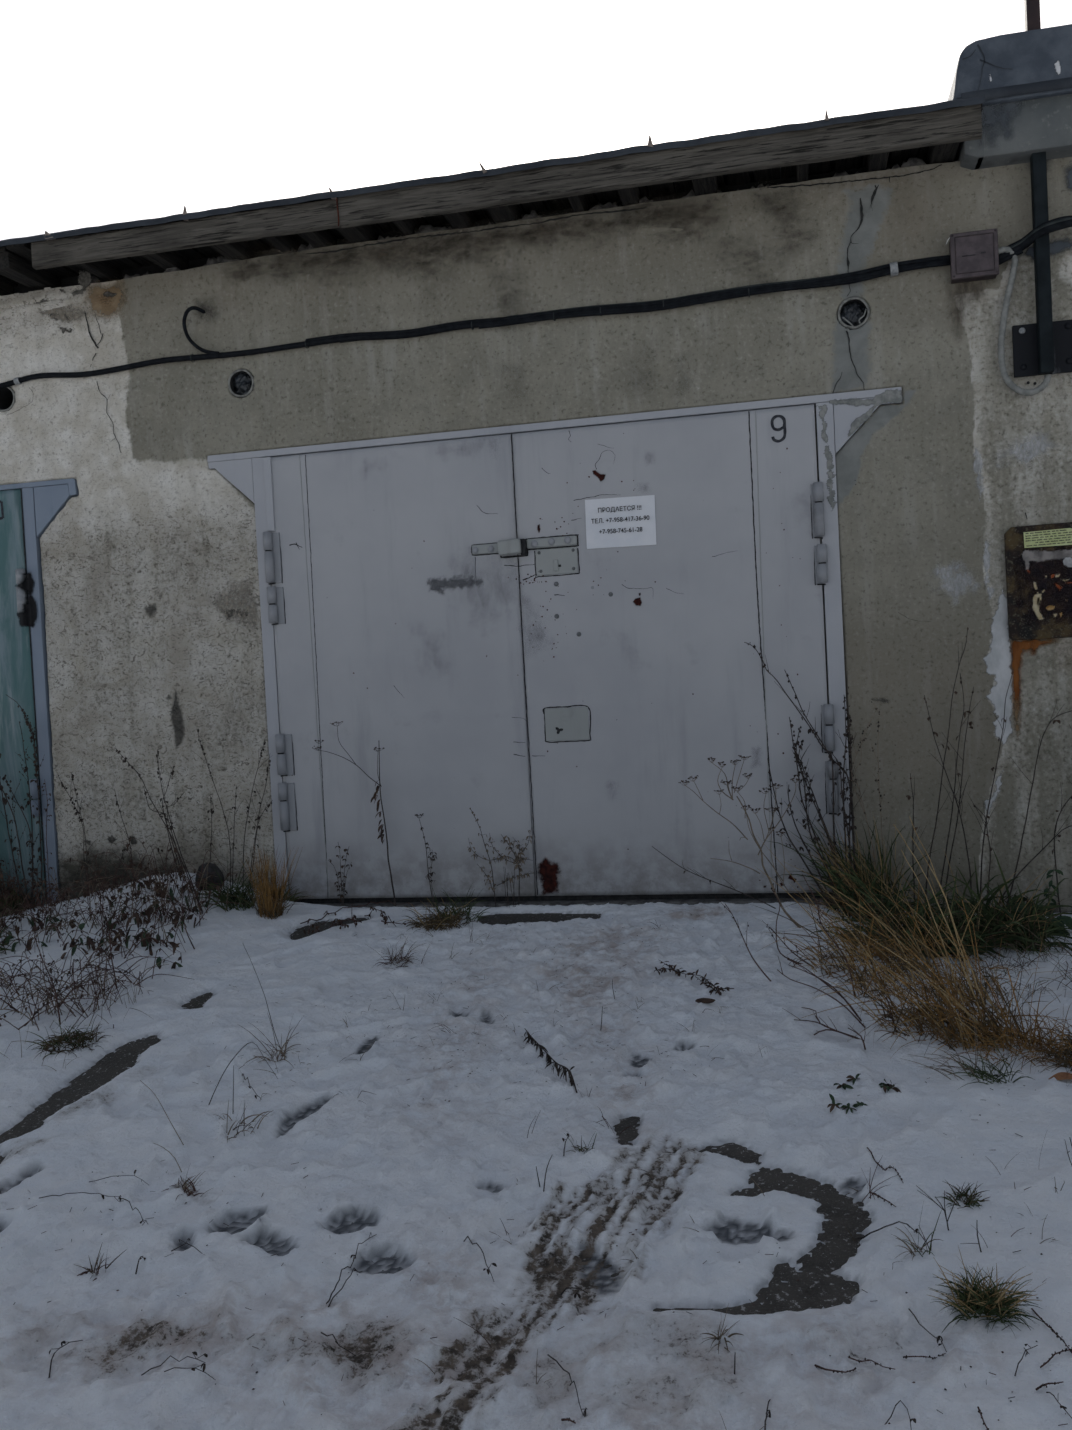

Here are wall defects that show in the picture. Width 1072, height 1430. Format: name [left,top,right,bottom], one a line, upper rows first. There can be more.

crack [767,164,942,296]
crack [833,331,865,393]
peeling [983,543,1013,744]
rust [1011,639,1058,733]
rust [538,858,561,895]